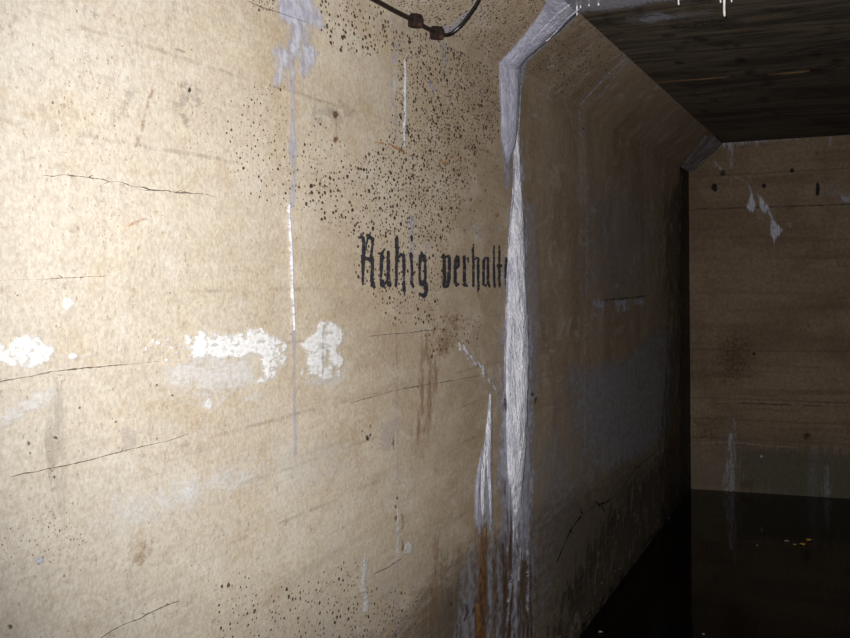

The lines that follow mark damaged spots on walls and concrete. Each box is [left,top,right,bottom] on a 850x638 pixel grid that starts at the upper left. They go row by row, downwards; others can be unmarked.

damp [273,0,323,161]
crack [44,175,214,197]
damp [747,192,782,243]
damp [288,178,296,343]
peeling [0,334,54,369]
crack [0,361,157,382]
peeling [145,328,287,409]
peeling [301,321,344,384]
crack [11,434,187,477]